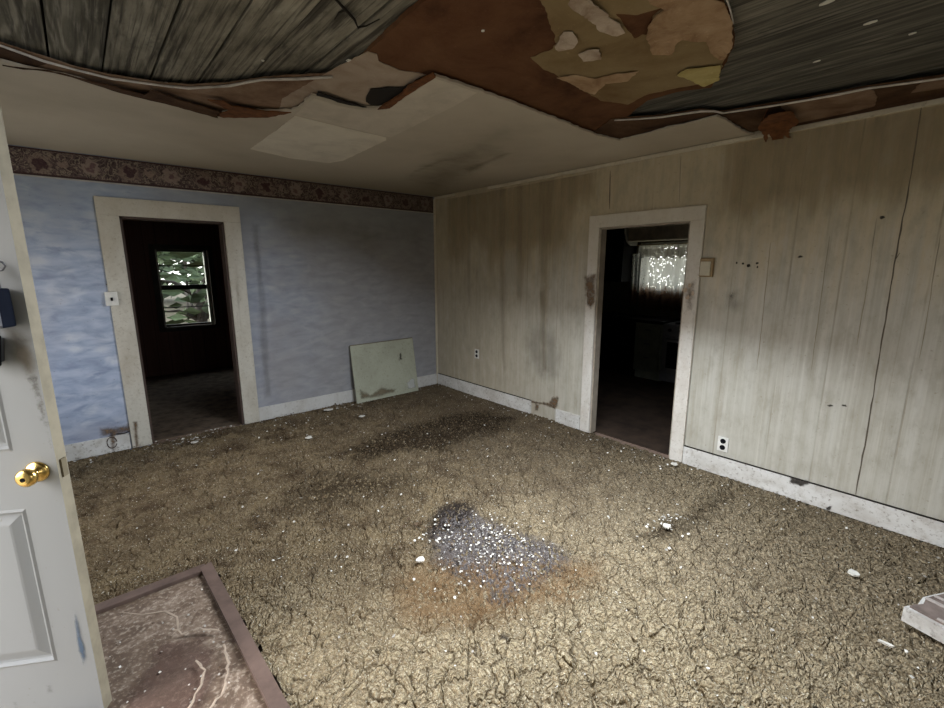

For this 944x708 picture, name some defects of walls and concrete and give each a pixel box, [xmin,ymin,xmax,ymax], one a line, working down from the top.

crack [334,0,380,29]
peeling [758,108,799,142]
crack [855,108,922,495]
leakage [531,397,558,410]